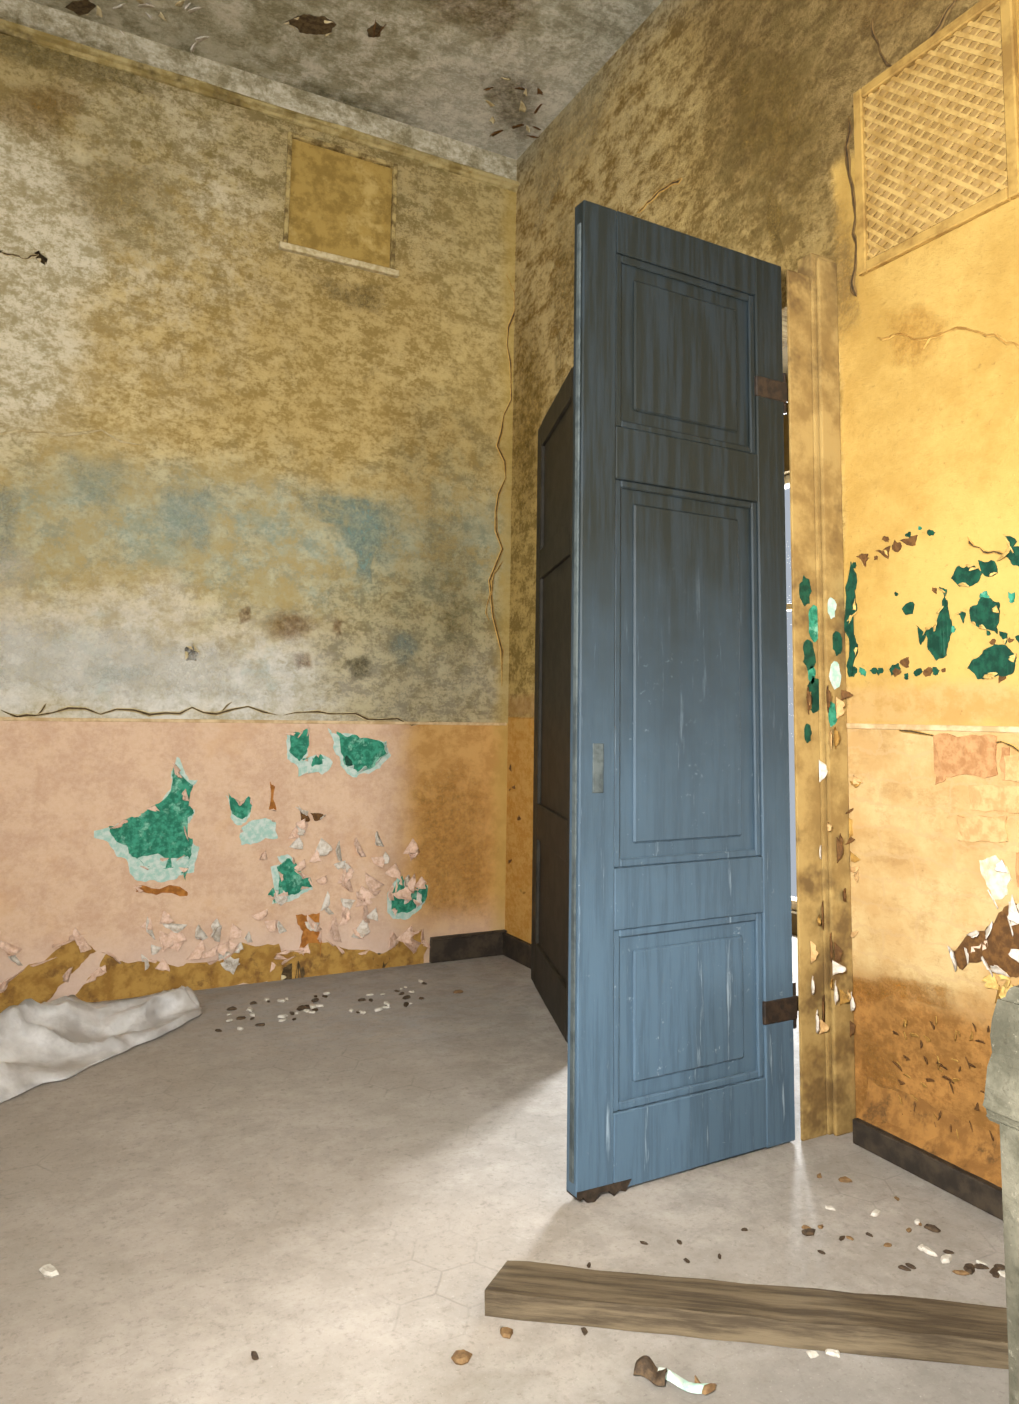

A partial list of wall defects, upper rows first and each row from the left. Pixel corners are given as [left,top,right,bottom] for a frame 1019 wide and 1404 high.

peeling [65,0,202,22]
peeling [284,14,336,37]
hole [0,250,48,265]
crack [877,326,1019,350]
crack [1,702,439,726]
peeling [285,727,391,777]
peeling [799,526,1019,782]
peeling [94,757,199,896]
peeling [0,782,430,1013]
flaking render [933,733,1019,1003]
peeling [810,901,858,1037]
peeling [892,1015,994,1142]